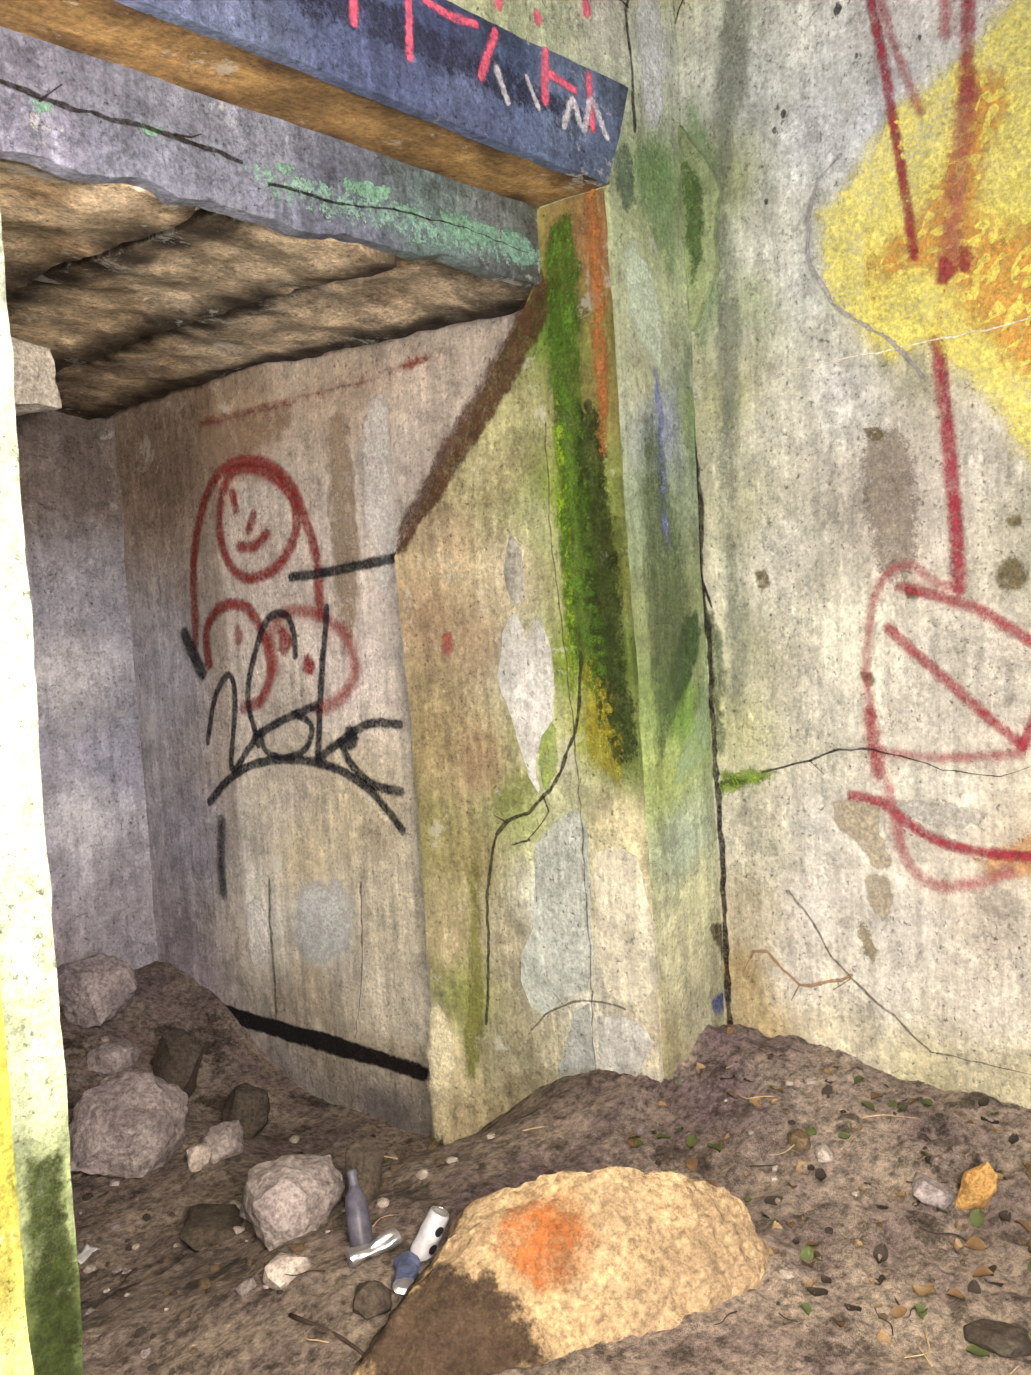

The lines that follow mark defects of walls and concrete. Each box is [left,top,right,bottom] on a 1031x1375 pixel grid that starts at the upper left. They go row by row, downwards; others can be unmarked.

crack [620,0,637,133]
leakage [637,0,665,123]
crack [485,423,626,1056]
leakage [543,214,638,786]
leakage [625,240,689,757]
leakage [688,0,749,755]
leakage [755,571,770,589]
crack [694,430,1031,1075]